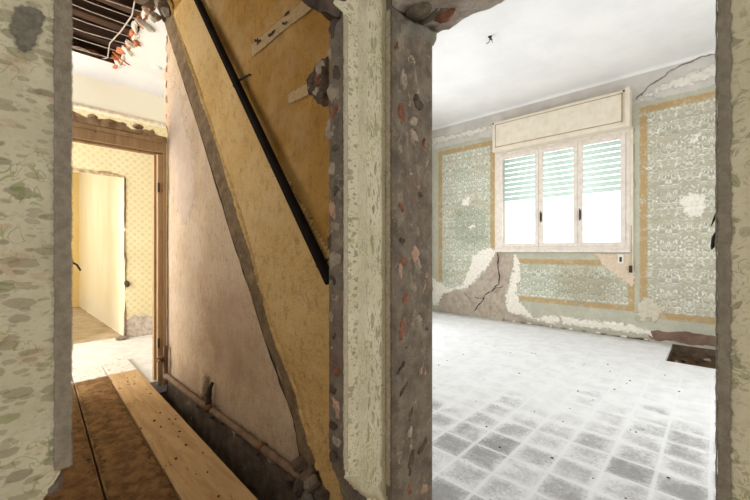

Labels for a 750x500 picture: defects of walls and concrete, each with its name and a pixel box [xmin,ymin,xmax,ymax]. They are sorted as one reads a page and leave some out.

spalling [134,0,319,471]
flaking render [306,17,344,462]
flaking render [344,6,586,500]
crack [464,252,502,311]
crack [636,54,714,100]
flaking render [640,0,733,500]